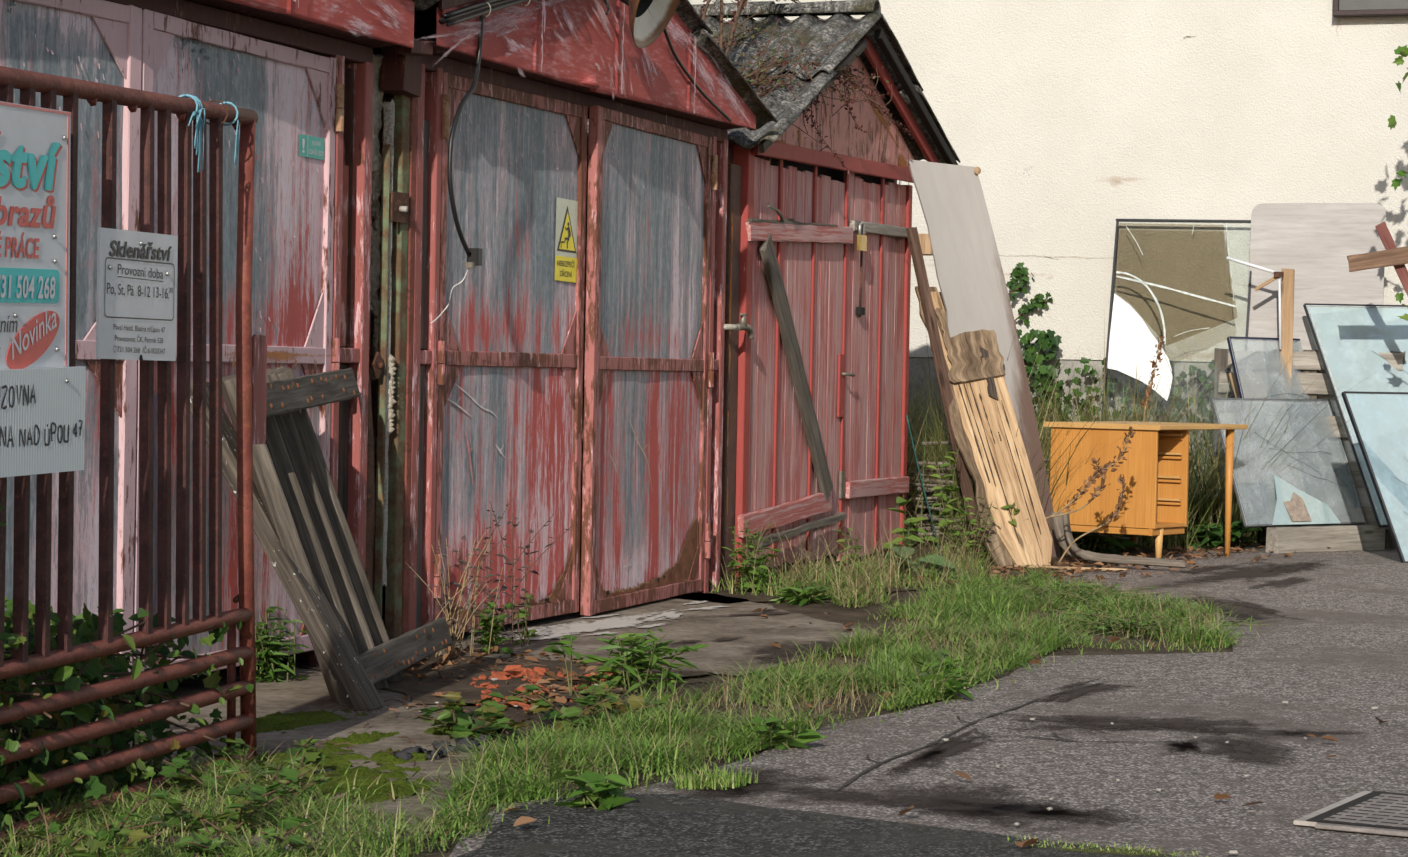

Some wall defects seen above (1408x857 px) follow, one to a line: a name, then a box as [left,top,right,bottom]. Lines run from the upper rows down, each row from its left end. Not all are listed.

peeling [333,0,398,35]
peeling [427,0,578,73]
peeling [587,0,657,98]
peeling [668,19,747,120]